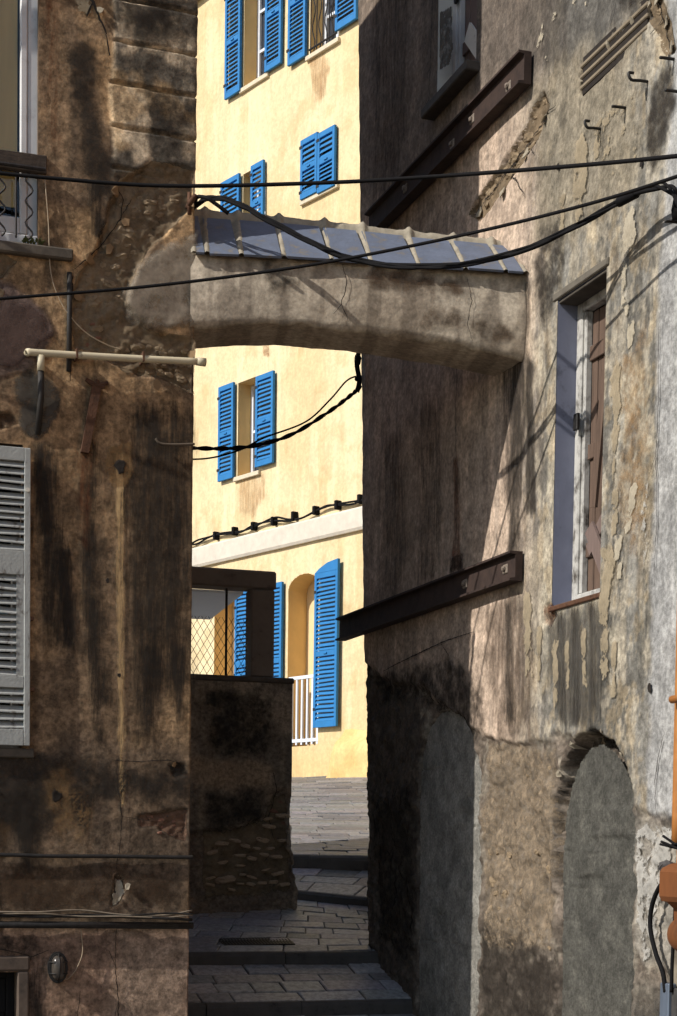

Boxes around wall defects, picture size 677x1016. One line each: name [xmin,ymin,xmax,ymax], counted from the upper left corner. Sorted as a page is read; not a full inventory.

crack [76,0,110,56]
water stain [122,0,185,51]
spalling [579,0,676,96]
spalling [469,92,550,221]
water stain [503,353,535,551]
water stain [0,369,194,910]
water stain [208,690,272,754]
water stain [370,660,482,728]
water stain [487,595,532,734]
peeling [523,591,570,708]
peeling [598,483,648,697]
spalling [112,879,130,905]